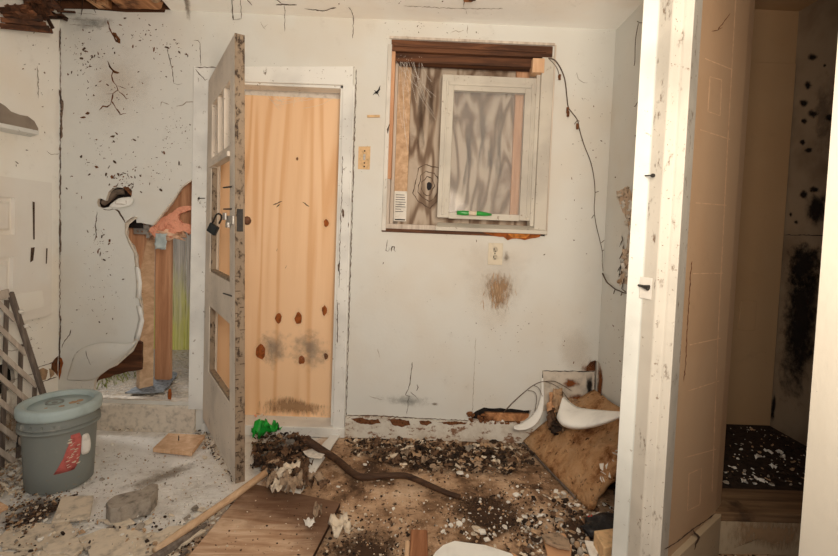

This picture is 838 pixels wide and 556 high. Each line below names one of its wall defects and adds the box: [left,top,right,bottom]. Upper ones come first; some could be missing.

crack [261,0,354,38]
crack [409,2,502,32]
crack [99,62,129,115]
water stain [800,97,832,136]
crack [0,13,120,384]
water stain [800,187,825,223]
flaking render [616,186,632,293]
water stain [782,248,819,384]
spalling [352,407,530,427]